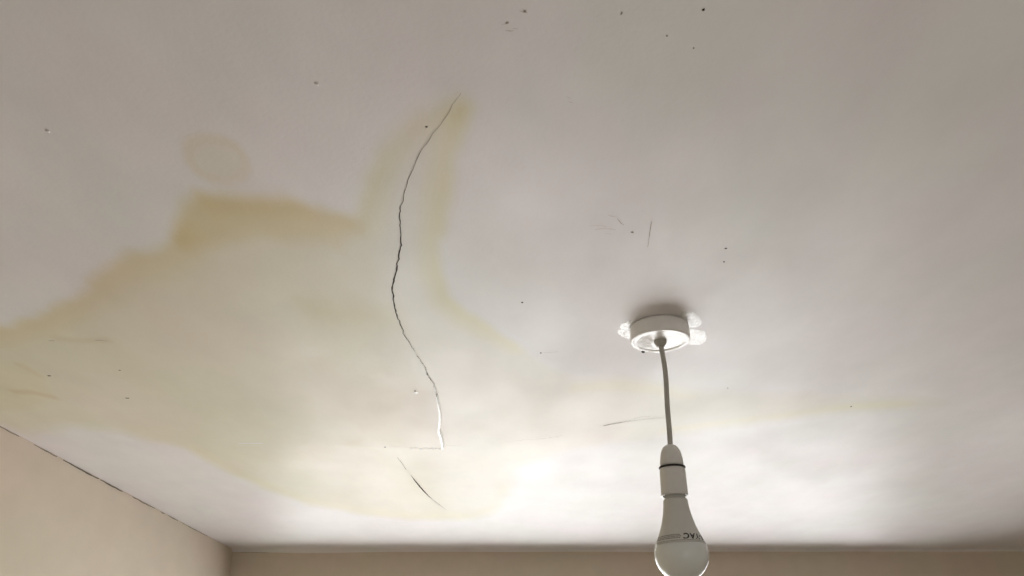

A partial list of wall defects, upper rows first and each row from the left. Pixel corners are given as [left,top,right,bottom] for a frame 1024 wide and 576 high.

crack [391,95,460,450]
water stain [0,78,954,522]